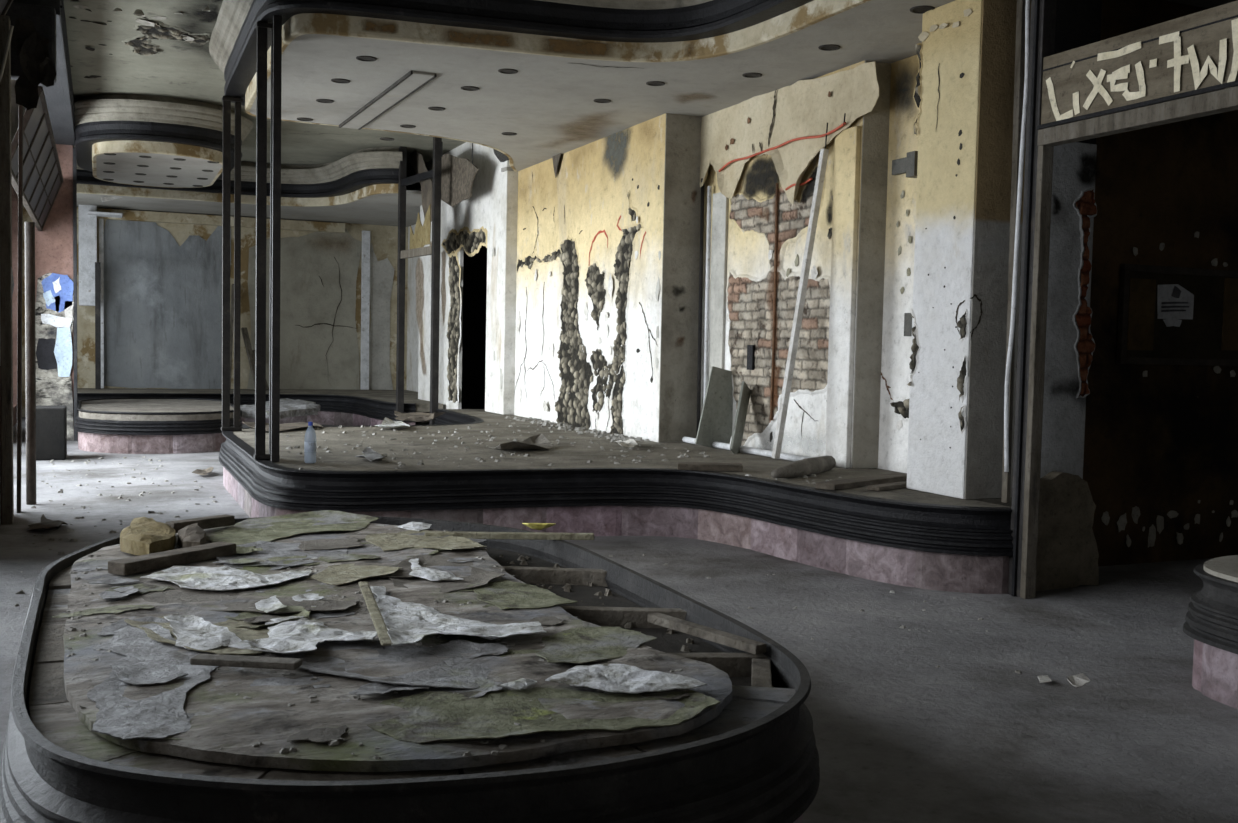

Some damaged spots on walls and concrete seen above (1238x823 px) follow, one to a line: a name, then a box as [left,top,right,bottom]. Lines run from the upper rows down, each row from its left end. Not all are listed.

spalling [913,9,972,137]
spalling [441,226,494,405]
spalling [516,178,649,436]
spalling [726,163,833,447]
spalling [890,308,921,430]
spalling [1073,188,1097,399]